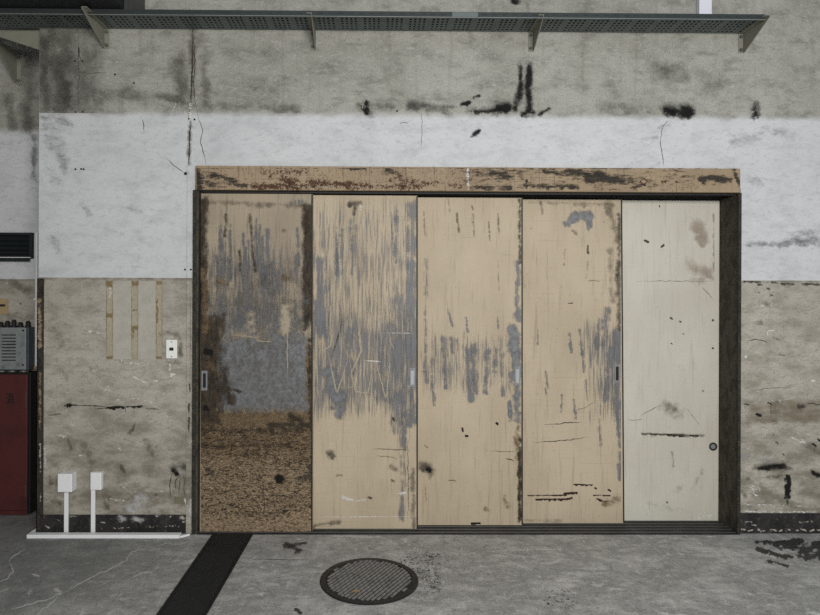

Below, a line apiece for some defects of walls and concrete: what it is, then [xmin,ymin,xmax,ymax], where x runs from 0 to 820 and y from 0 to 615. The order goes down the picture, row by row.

crack [167,29,206,172]
leakage [513,65,535,117]
rust [196,168,477,532]
rust [499,427,522,522]